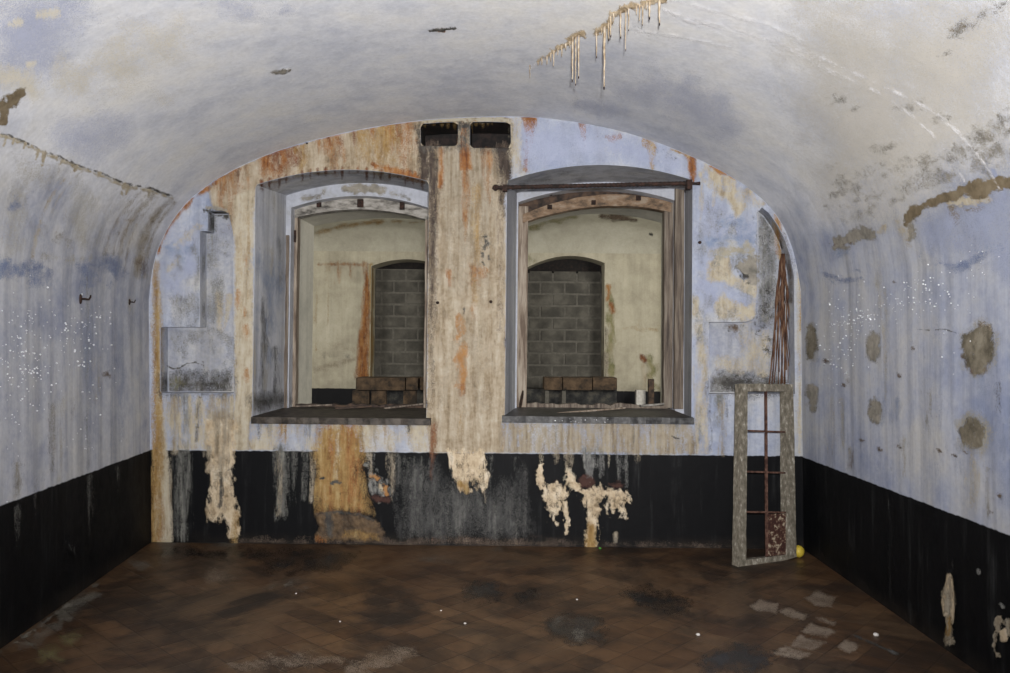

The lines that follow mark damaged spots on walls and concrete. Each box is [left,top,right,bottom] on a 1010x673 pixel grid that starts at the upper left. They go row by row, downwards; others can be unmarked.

flaking render [936,0,1008,57]
flaking render [0,63,45,126]
corrosion [157,117,537,256]
water stain [529,0,1010,286]
peeling [823,105,1010,258]
water stain [0,0,802,592]
corrosion [453,305,478,396]
flaking render [804,321,828,363]
flaking render [958,316,1003,378]
corrosion [309,424,376,515]
flaking render [867,396,883,424]
flaking render [937,409,997,458]